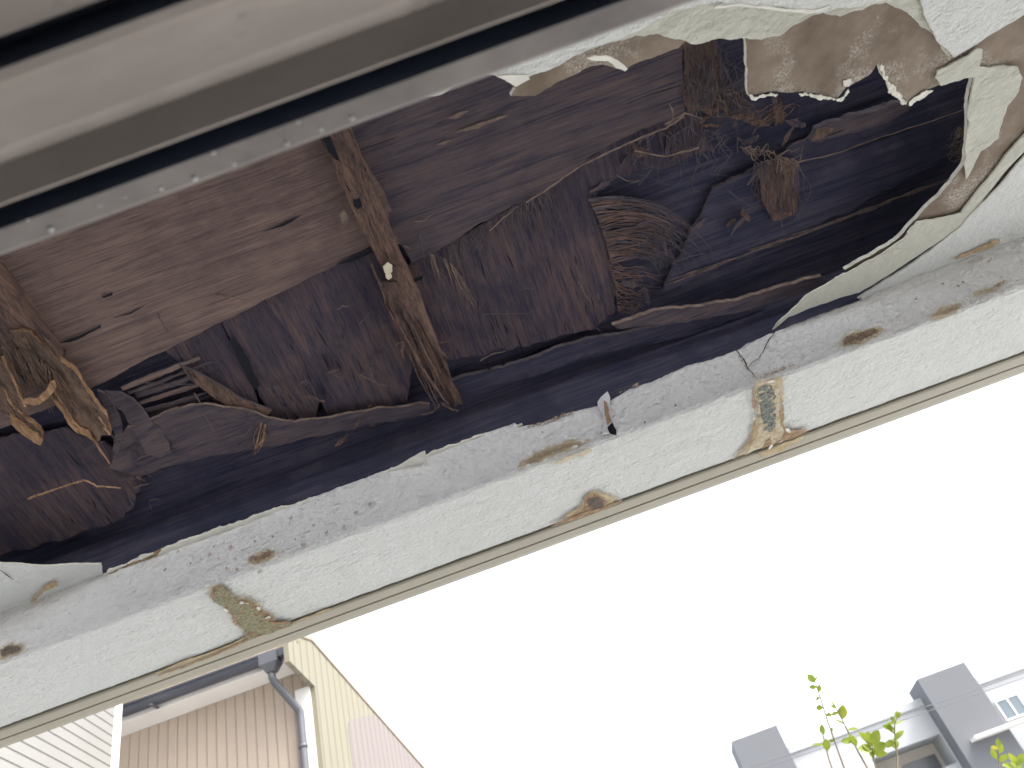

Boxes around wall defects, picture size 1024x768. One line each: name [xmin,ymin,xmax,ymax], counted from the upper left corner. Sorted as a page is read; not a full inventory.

peeling [586,0,932,71]
peeling [497,74,530,87]
peeling [773,133,1024,330]
crack [734,331,794,379]
peeling [597,383,639,435]
peeling [374,432,488,476]
peeling [107,496,319,574]
rust [551,492,622,527]